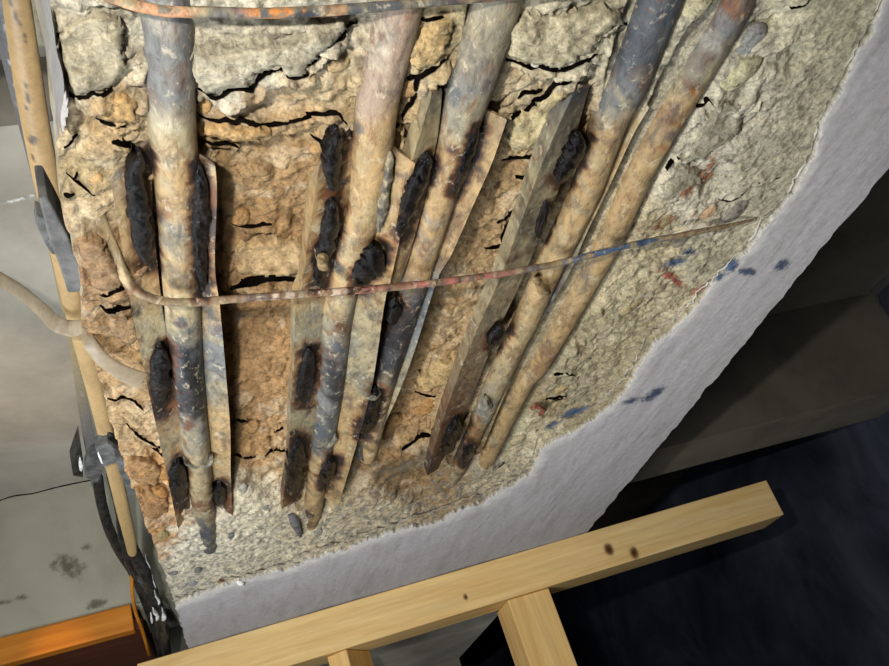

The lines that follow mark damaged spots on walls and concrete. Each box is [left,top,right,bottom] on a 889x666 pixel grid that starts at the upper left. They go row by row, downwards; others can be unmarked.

spalling [190,0,377,8]
spalling [50,0,149,372]
crack [68,88,137,148]
crack [198,20,358,148]
spalling [190,12,378,296]
crack [396,57,448,143]
spalling [393,4,468,151]
spalling [438,0,636,279]
crack [505,54,598,121]
spalling [496,0,721,416]
crack [99,286,131,314]
crack [230,275,296,290]